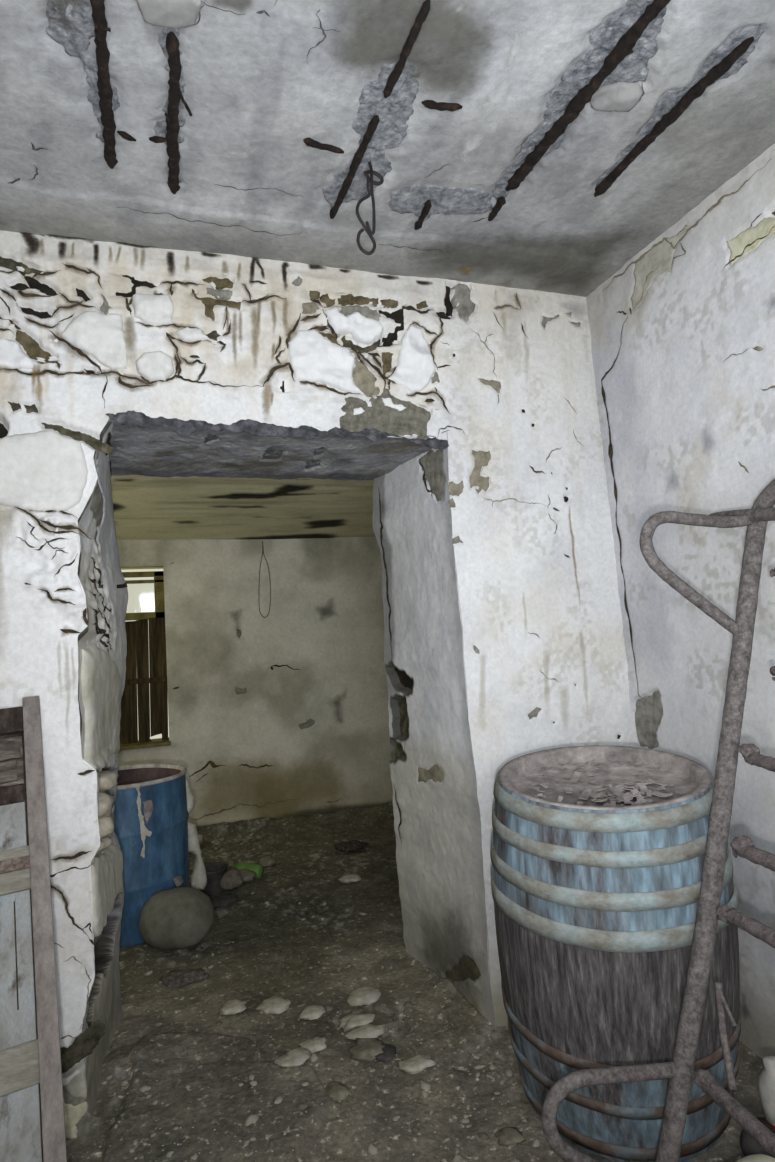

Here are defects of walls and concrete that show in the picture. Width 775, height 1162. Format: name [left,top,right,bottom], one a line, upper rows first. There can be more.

spalling [46,0,201,194]
spalling [303,0,671,230]
spalling [594,24,764,197]
spalling [8,402,38,413]
spalling [0,256,58,296]
spalling [19,306,52,319]
spalling [15,330,60,364]
spalling [76,275,156,315]
spalling [105,276,491,508]
crack [479,158,775,698]
crack [17,507,112,654]
peeling [90,463,103,555]